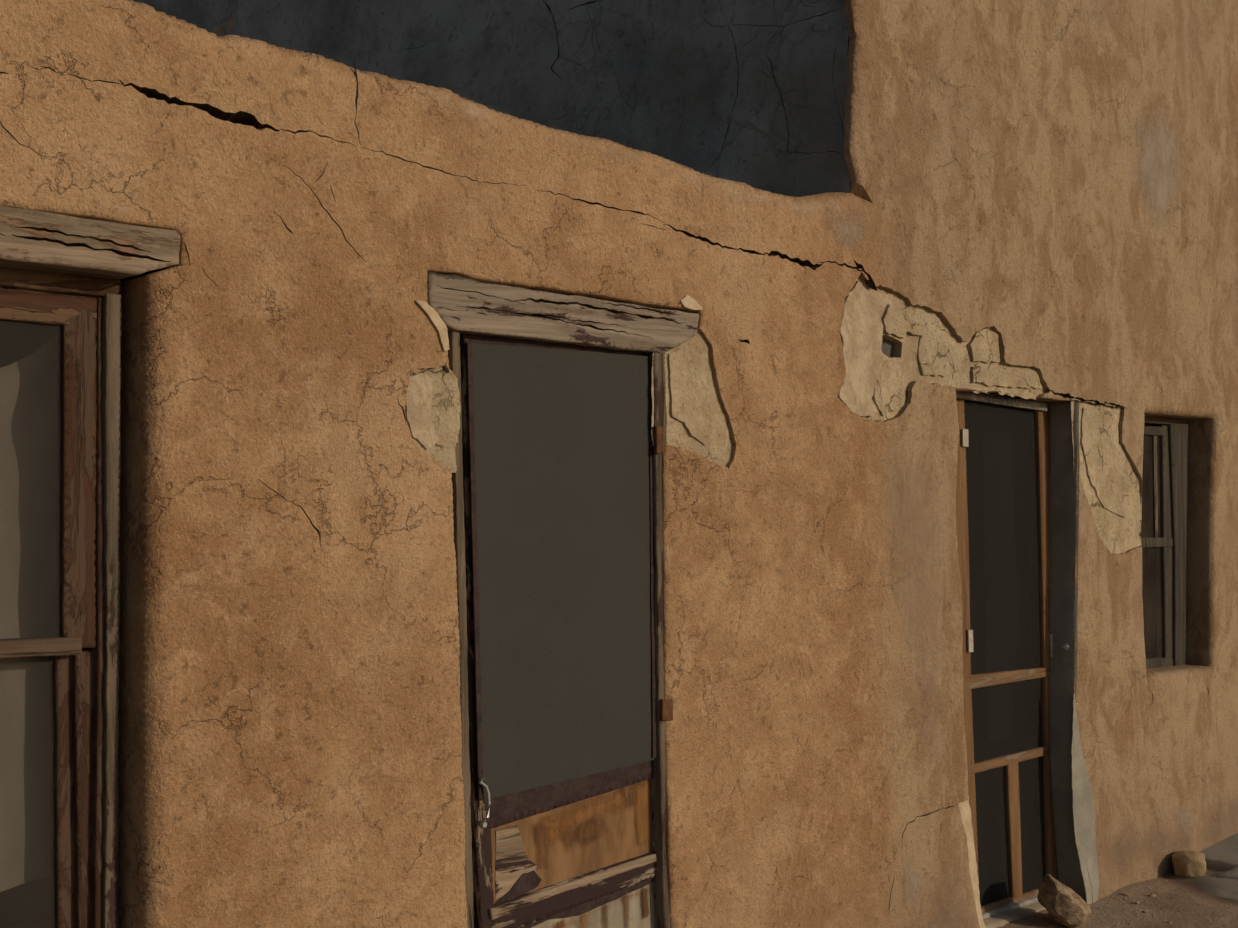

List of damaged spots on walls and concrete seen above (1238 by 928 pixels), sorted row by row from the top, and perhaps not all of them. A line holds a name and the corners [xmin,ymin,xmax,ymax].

crack [0,122,52,161]
crack [41,60,878,291]
crack [700,0,845,162]
peeling [415,300,449,351]
peeling [405,366,461,473]
peeling [680,295,703,310]
peeling [651,331,732,467]
peeling [838,277,1046,421]
peeling [1071,398,1142,554]